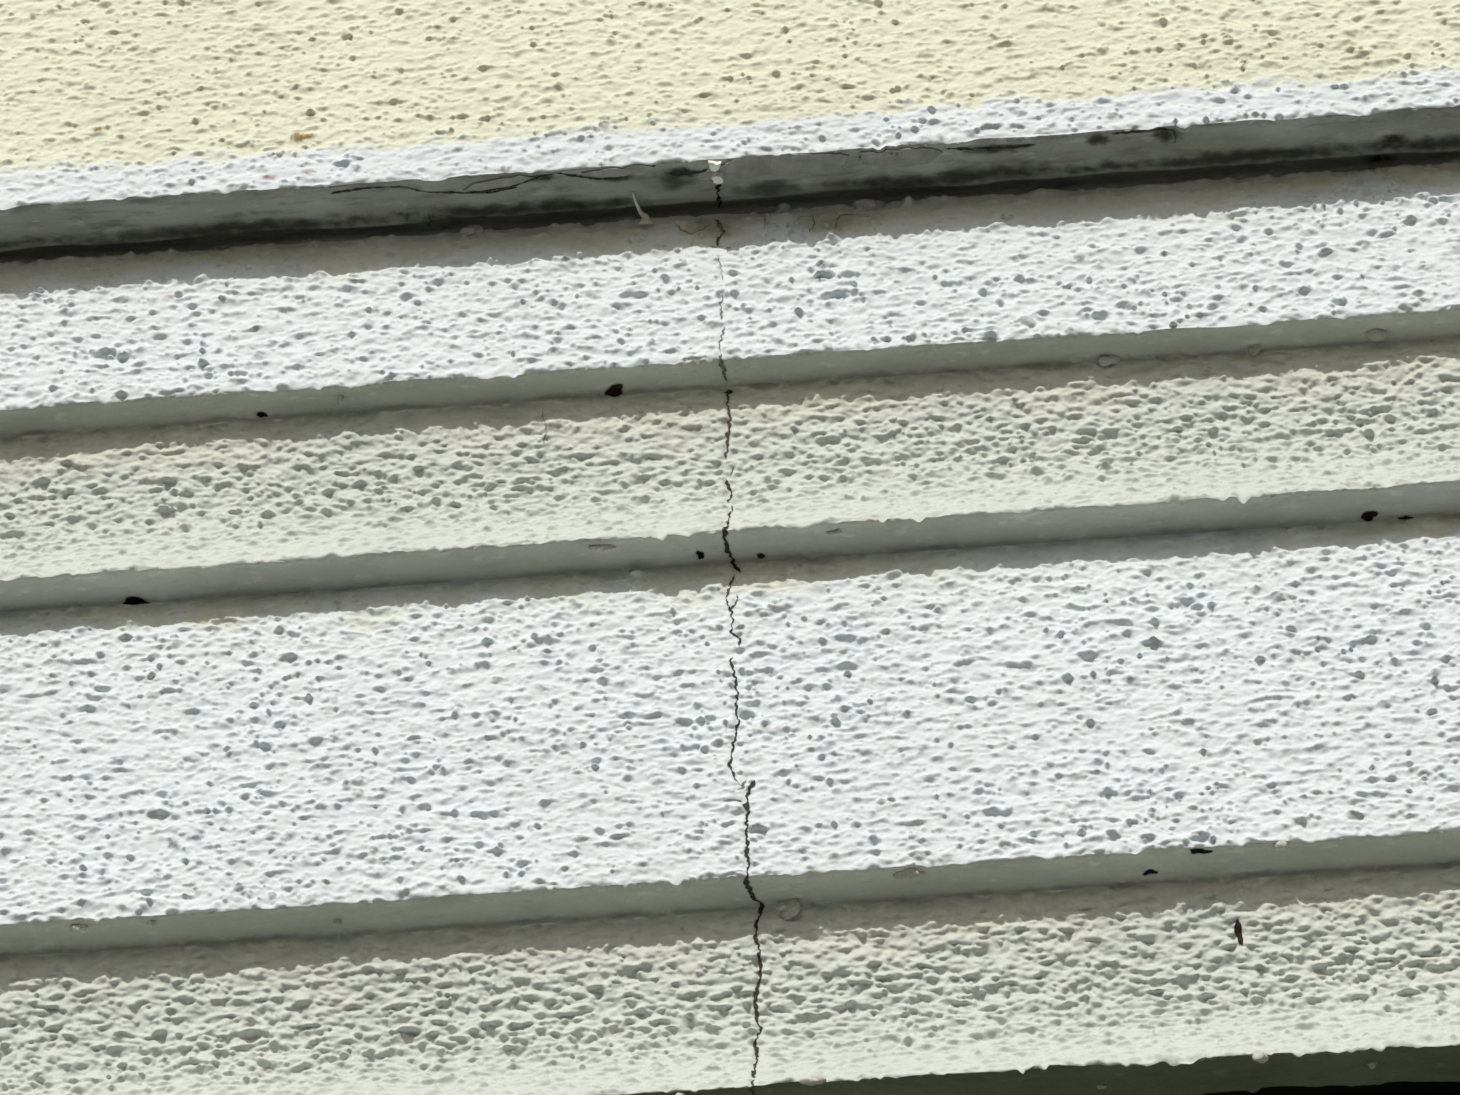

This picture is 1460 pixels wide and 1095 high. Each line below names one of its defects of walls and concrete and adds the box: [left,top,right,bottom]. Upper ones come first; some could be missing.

crack [331,165,765,1095]